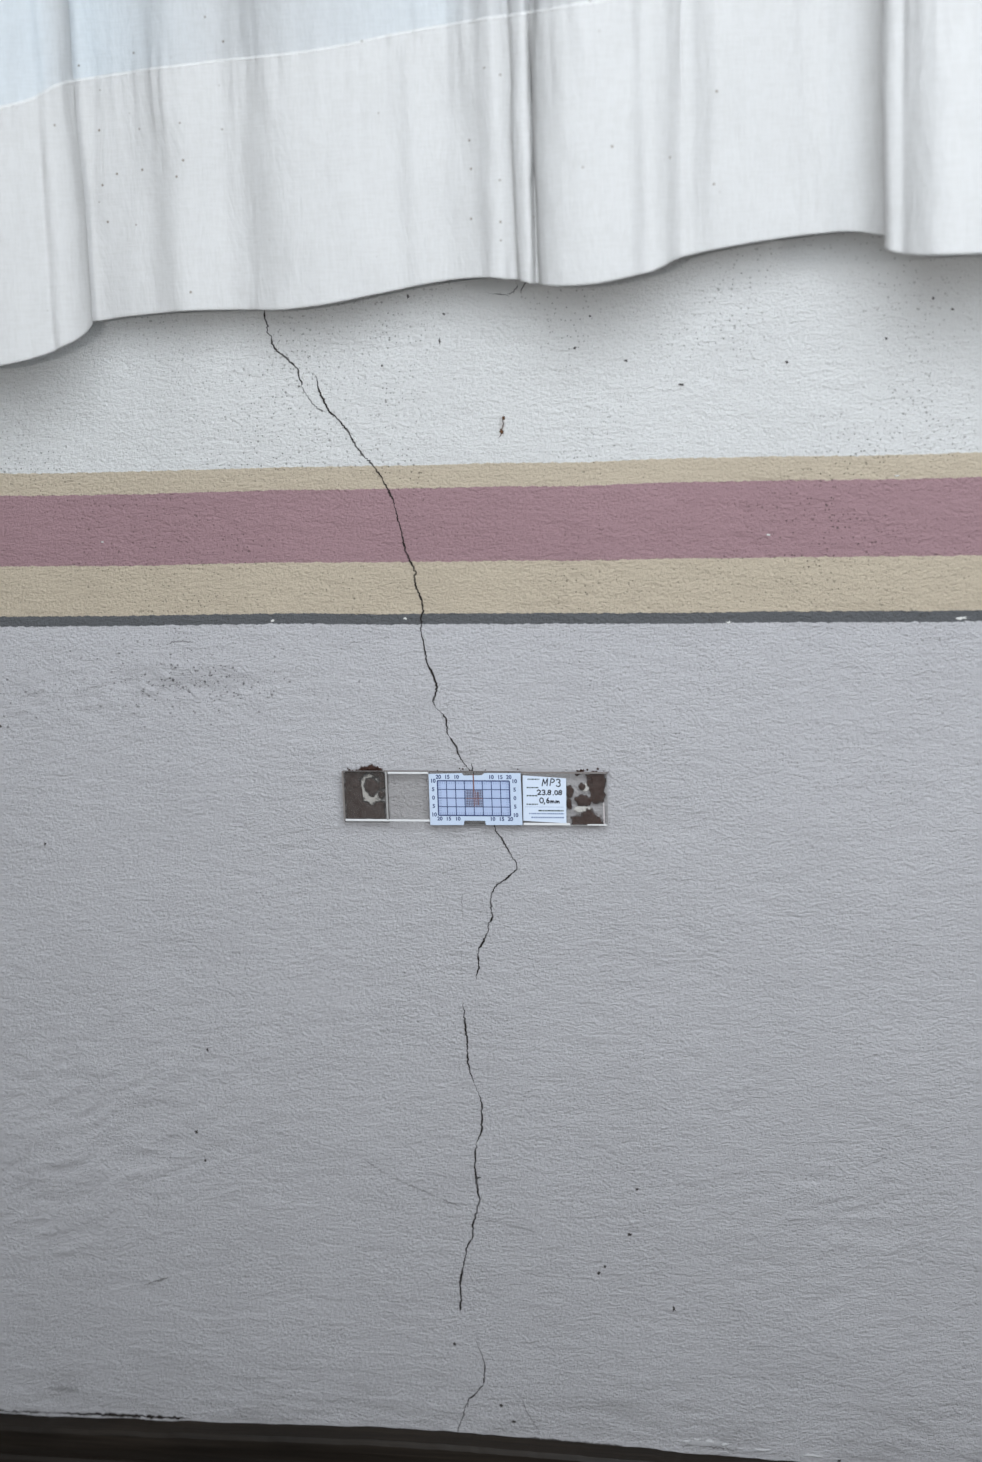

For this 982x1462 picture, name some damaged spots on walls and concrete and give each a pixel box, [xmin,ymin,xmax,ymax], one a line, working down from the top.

crack [263,311,474,774]
crack [458,825,520,1432]